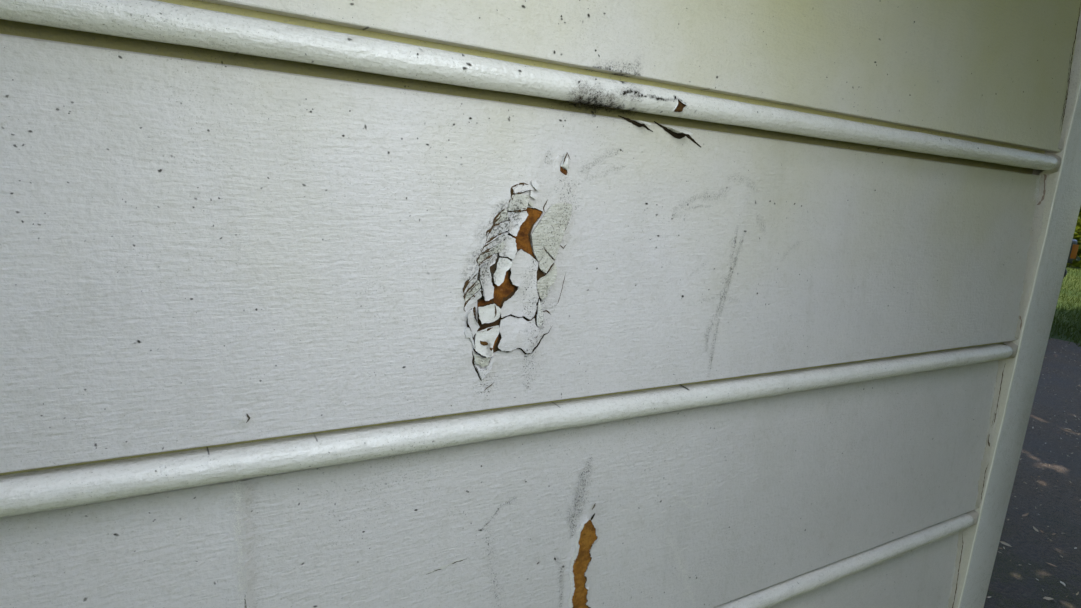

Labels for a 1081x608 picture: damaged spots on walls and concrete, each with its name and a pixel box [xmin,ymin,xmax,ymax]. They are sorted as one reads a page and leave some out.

crack [618,115,701,147]
peeling [428,145,591,400]
peeling [560,458,601,608]